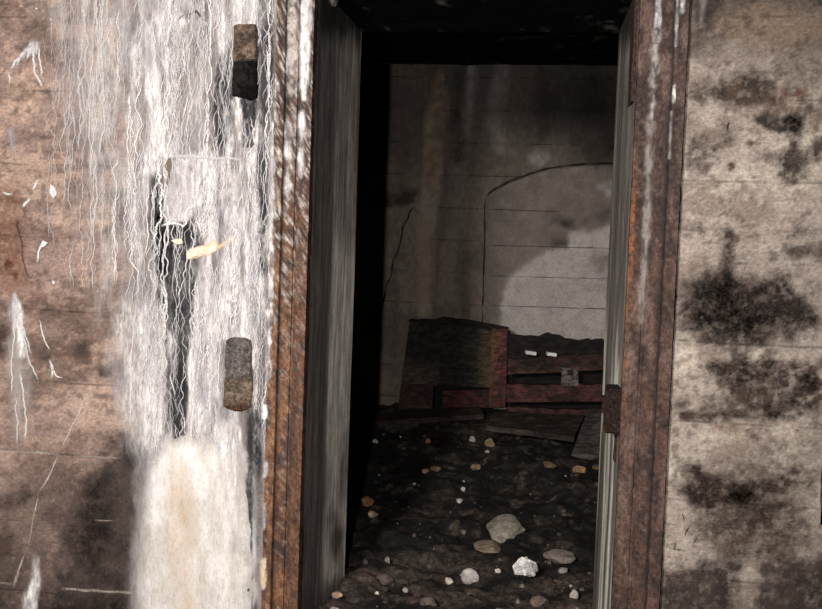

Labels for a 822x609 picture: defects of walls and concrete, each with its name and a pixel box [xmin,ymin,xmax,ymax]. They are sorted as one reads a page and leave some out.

damp [8,45,43,86]
damp [693,75,822,183]
damp [23,0,274,609]
crack [382,210,411,304]
damp [0,292,37,440]
damp [678,354,822,422]
damp [660,461,822,609]